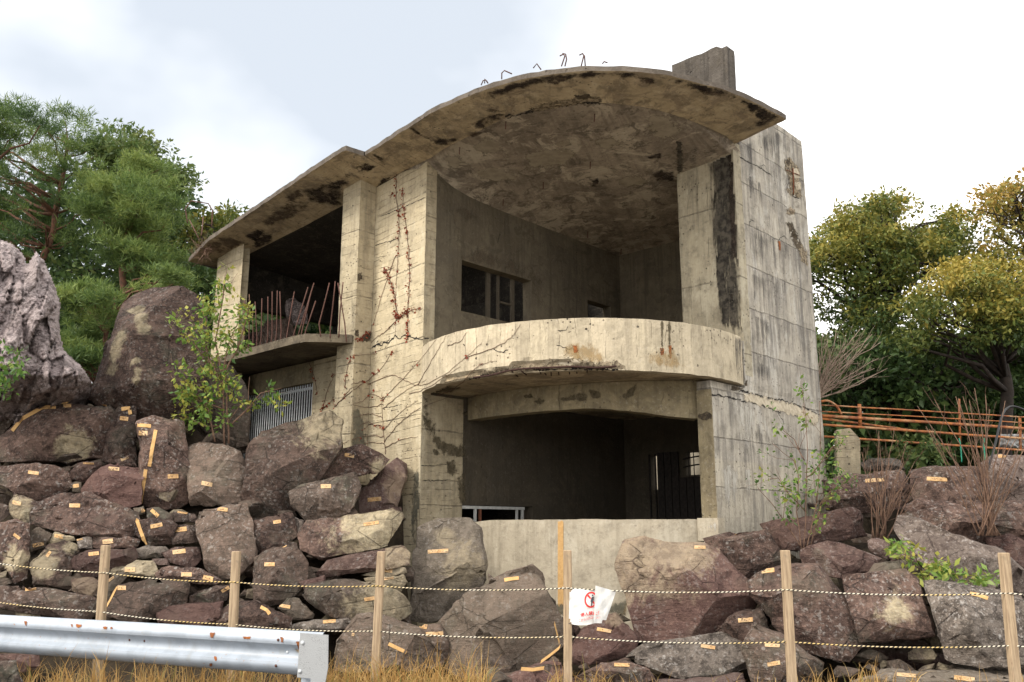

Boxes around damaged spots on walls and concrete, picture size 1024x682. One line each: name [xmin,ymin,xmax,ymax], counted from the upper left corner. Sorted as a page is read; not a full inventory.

damp [470,71,654,137]
damp [207,154,383,253]
spalling [784,157,802,199]
damp [711,154,742,354]
spalling [468,356,625,380]
rust [660,321,672,359]
crack [711,340,819,423]